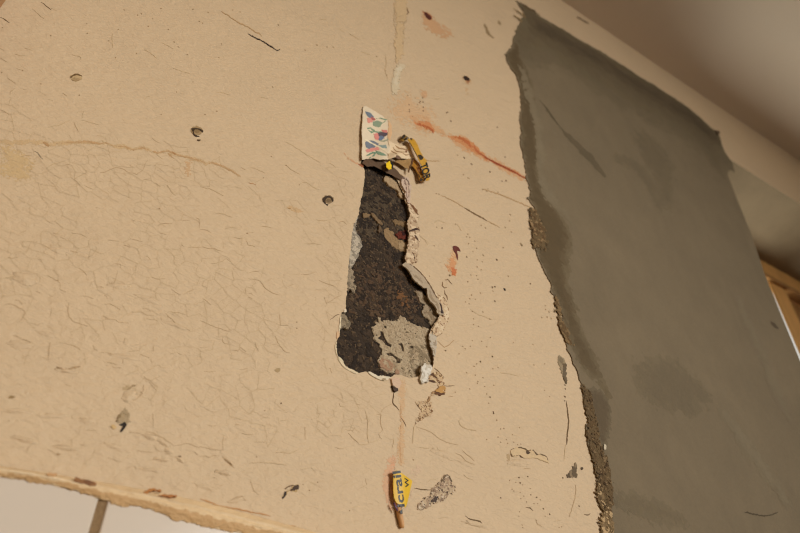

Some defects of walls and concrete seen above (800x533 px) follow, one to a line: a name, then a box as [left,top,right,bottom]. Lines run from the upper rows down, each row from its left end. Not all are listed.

rust [387,87,526,182]
crack [437,195,500,230]
crack [483,189,530,208]
crack [0,48,476,517]
flaking render [336,162,446,424]
spalling [507,447,549,463]
spalling [417,474,456,510]